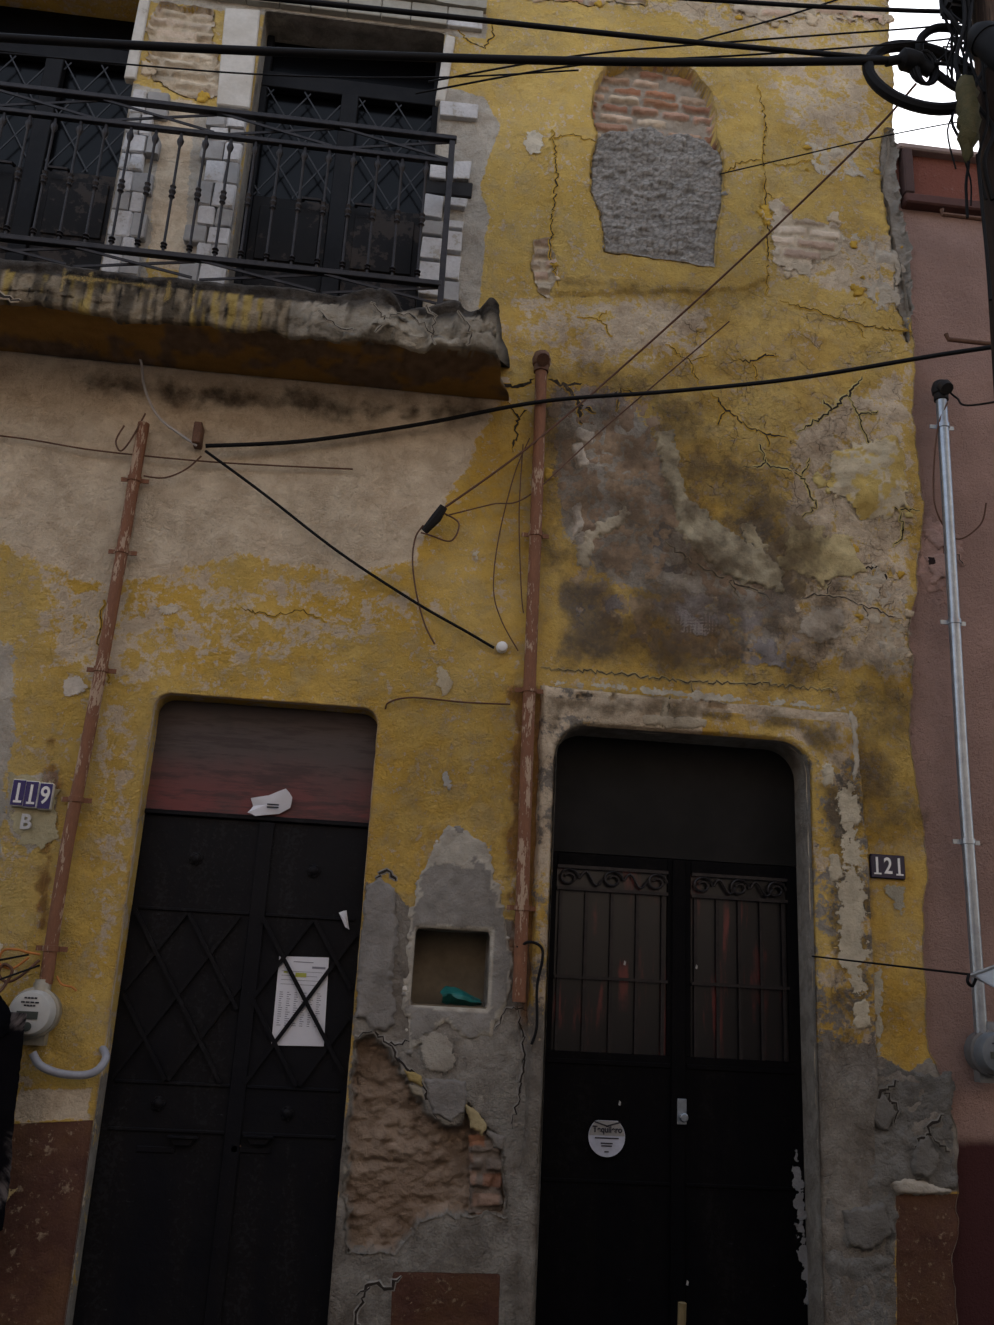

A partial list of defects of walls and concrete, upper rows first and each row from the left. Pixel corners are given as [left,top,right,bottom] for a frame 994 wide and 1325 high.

flaking render [531,237,561,298]
crack [548,129,597,287]
peeling [553,386,628,419]
crack [577,310,613,337]
flaking render [756,104,915,425]
corrosion [507,686,541,1019]
flaking render [340,877,508,1255]
crack [352,1275,402,1325]